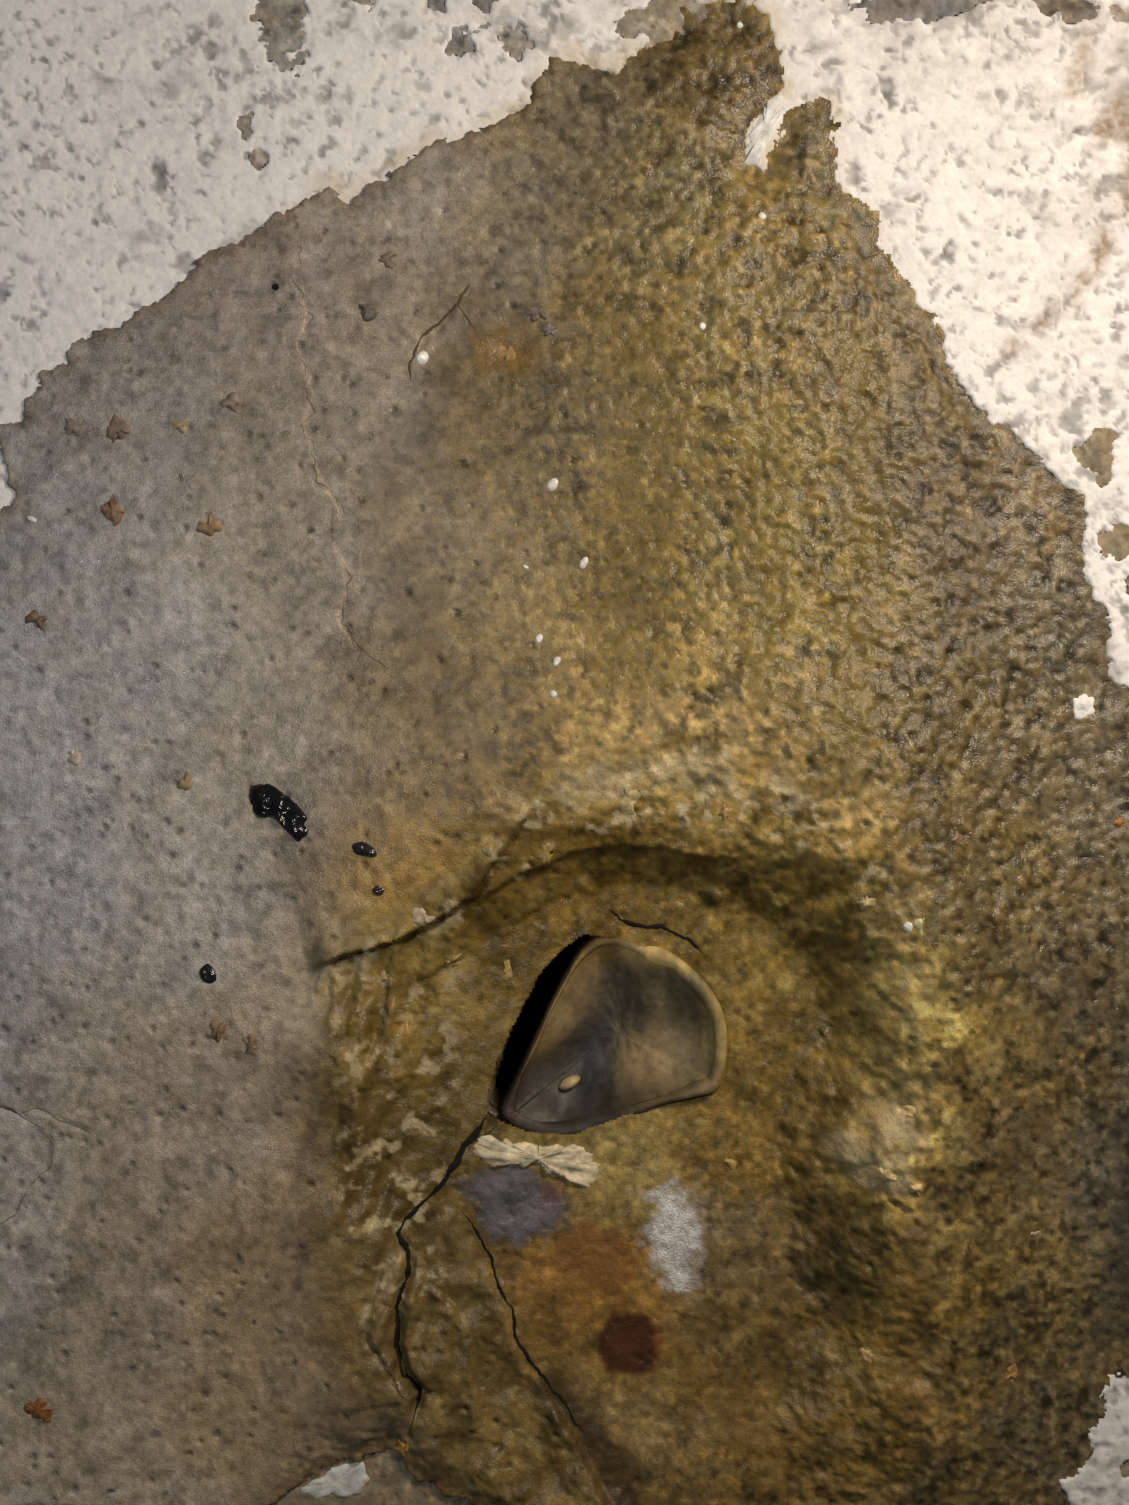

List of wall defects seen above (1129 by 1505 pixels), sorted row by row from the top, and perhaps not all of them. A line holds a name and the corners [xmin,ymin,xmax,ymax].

peeling [848,0,993,25]
peeling [1033,0,1129,23]
spalling [740,94,1129,696]
spalling [0,0,784,1505]
damp [409,25,1129,1505]
damp [342,1041,394,1082]
damp [346,1114,435,1171]
damp [350,1172,438,1238]
crack [329,862,497,1091]
crack [367,1112,585,1434]
rust [293,739,939,1505]
crack [610,909,701,951]